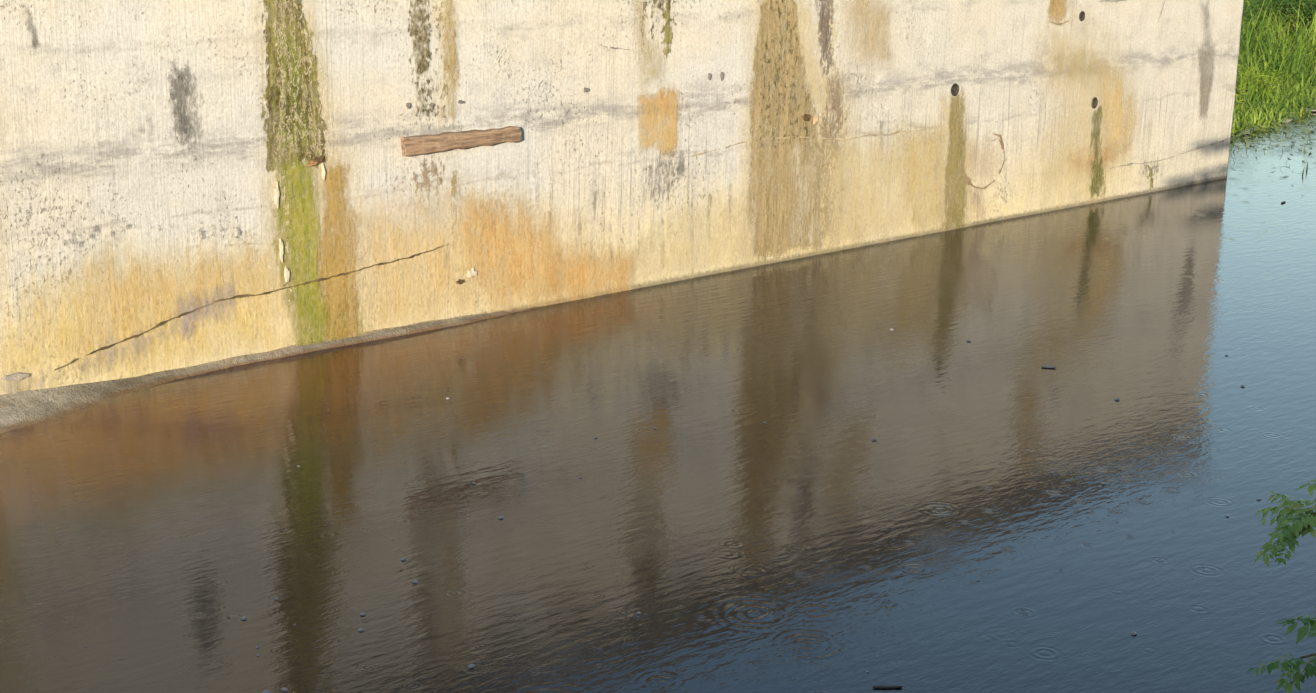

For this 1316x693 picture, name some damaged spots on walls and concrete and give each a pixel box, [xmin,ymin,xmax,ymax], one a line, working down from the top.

damp [409,0,429,113]
damp [446,0,457,87]
damp [641,0,674,57]
damp [7,0,362,395]
corrosion [641,91,678,154]
damp [656,0,967,270]
damp [1091,107,1104,197]
crack [54,244,448,370]